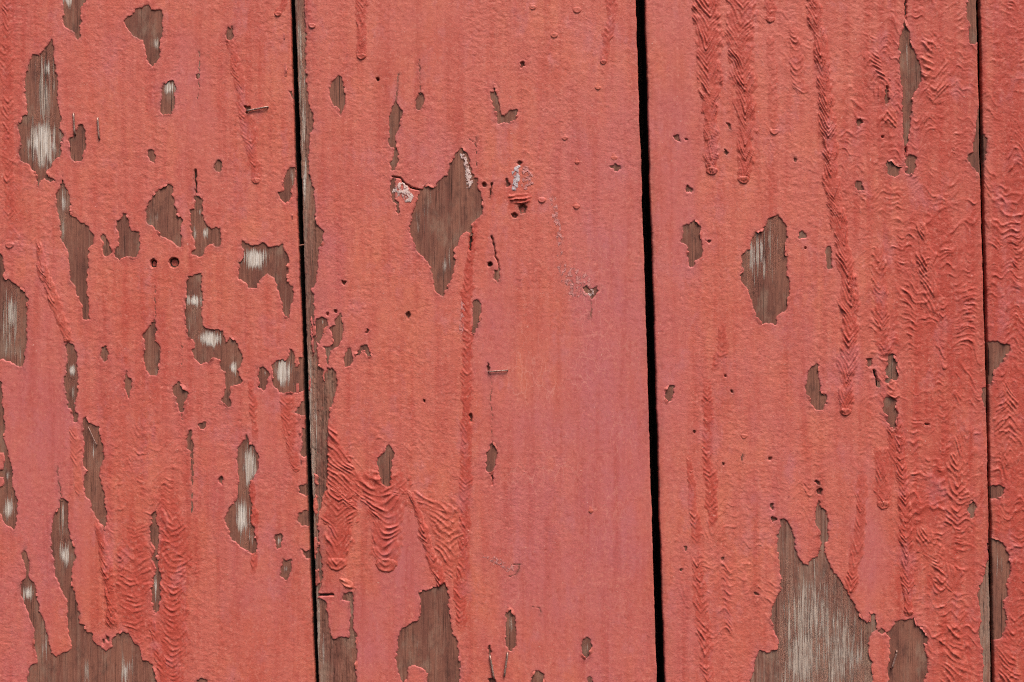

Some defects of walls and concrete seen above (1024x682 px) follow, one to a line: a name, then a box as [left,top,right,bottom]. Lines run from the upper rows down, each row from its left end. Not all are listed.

peeling [124,5,164,66]
peeling [0,254,29,367]
peeling [18,40,221,320]
peeling [183,274,243,408]
peeling [237,0,373,682]
peeling [388,101,484,296]
peeling [738,215,806,325]
peeling [225,435,259,554]
peeling [21,499,158,682]
peeling [395,584,462,682]
peeling [750,501,929,682]
peeling [977,536,1011,682]